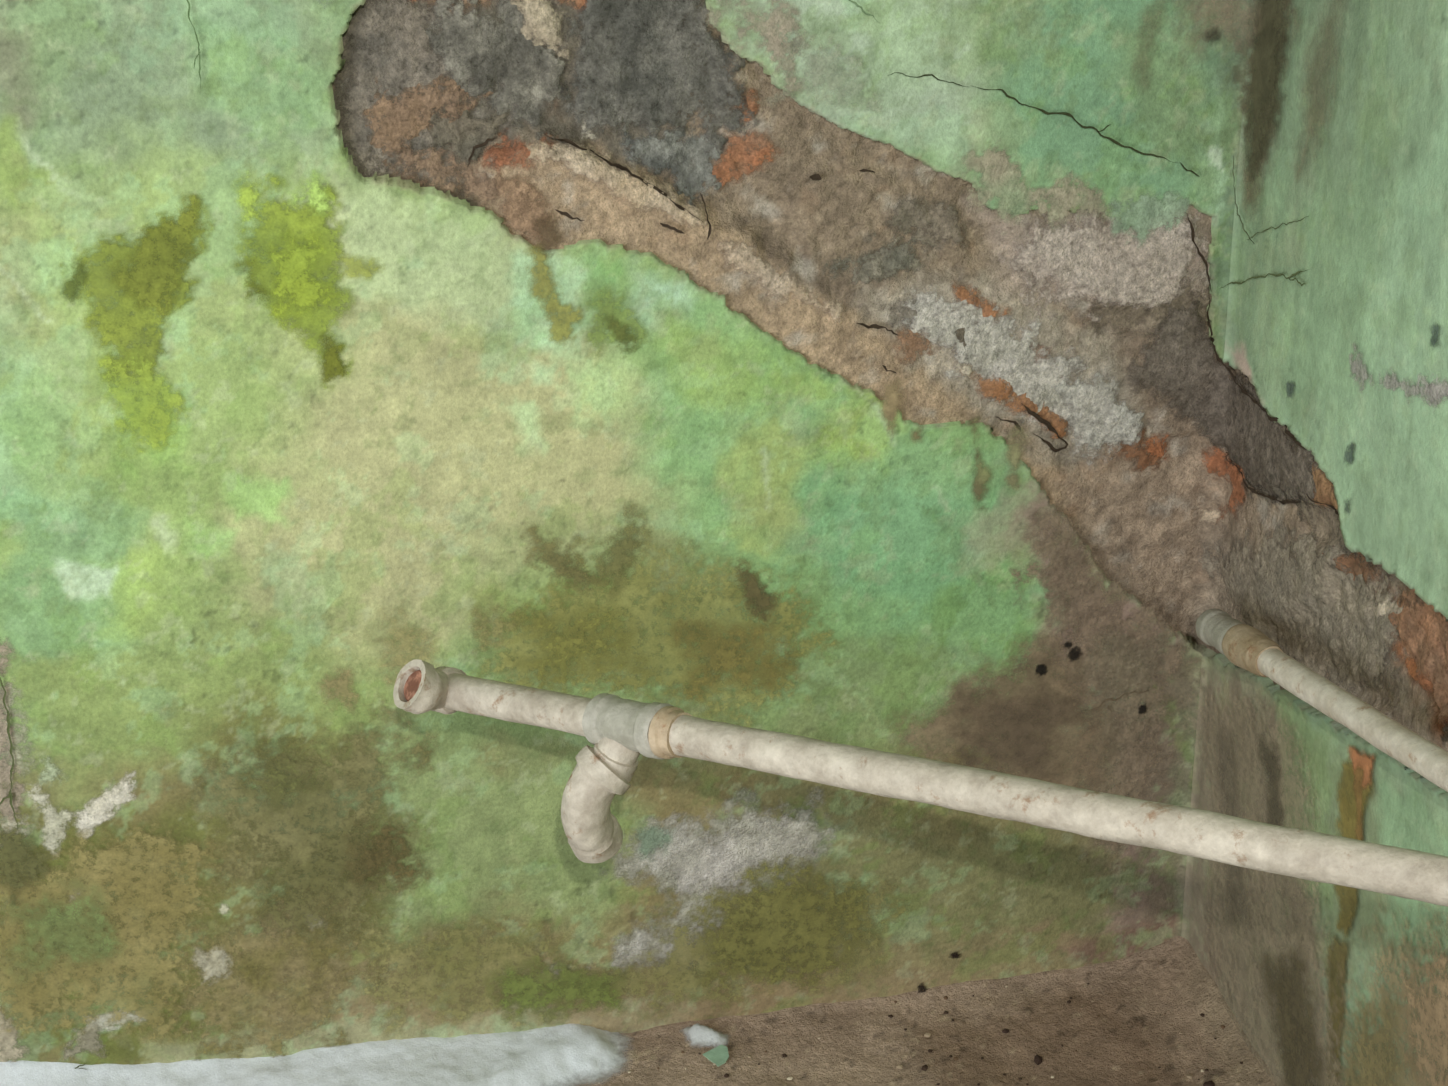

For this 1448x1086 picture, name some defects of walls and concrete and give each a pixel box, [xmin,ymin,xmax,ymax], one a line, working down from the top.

crack [890,72,1308,288]
damp [1189,0,1292,199]
damp [322,338,345,382]
flaking render [332,0,1448,752]
damp [474,506,836,726]
peeling [0,1011,26,1062]
peeling [0,643,135,856]
peeling [64,1010,146,1059]
peeling [163,888,383,1059]
damp [189,706,434,944]
damp [501,791,867,1015]
damp [1208,863,1448,1086]